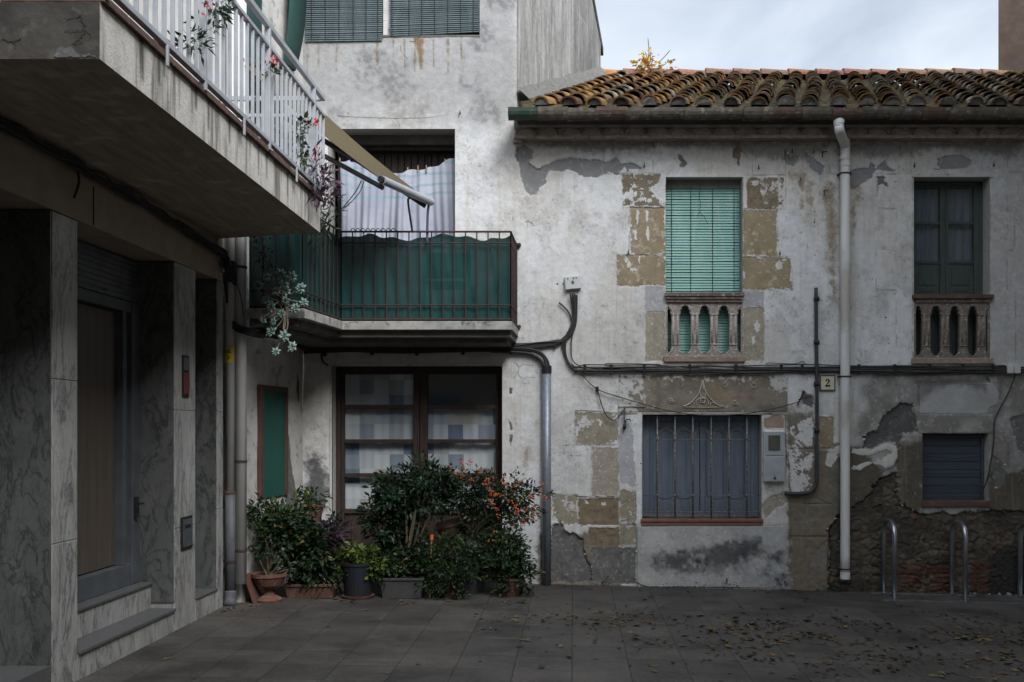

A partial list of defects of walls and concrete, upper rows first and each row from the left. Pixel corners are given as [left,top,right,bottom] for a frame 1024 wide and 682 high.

flaking render [850,161,895,189]
flaking render [931,154,972,170]
flaking render [515,145,666,287]
peeling [742,177,793,292]
flaking render [762,390,917,517]
flaking render [1010,415,1024,452]
leakage [305,454,330,508]
flaking render [551,411,642,584]
leakage [654,541,760,571]